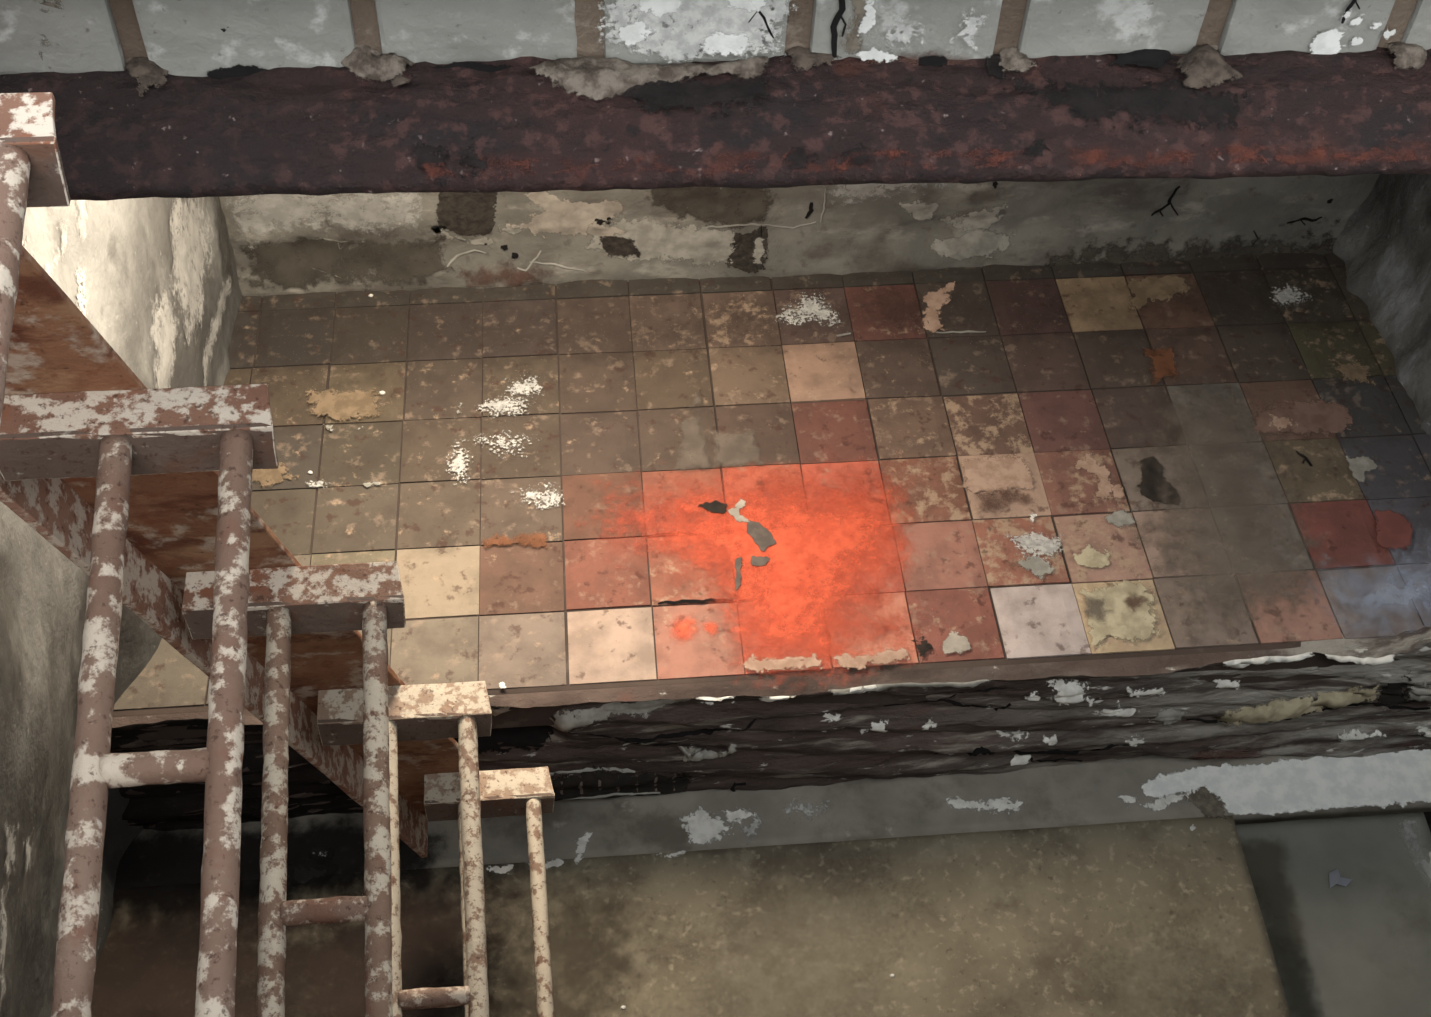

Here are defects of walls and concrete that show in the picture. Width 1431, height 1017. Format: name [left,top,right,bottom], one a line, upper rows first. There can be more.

crack [830,0,847,58]
peeling [1309,11,1396,55]
corrosion [621,76,771,120]
corrosion [1001,71,1428,164]
flaking render [436,191,768,273]
water stain [1214,652,1394,690]
water stain [1212,671,1431,727]
water stain [1118,724,1431,882]